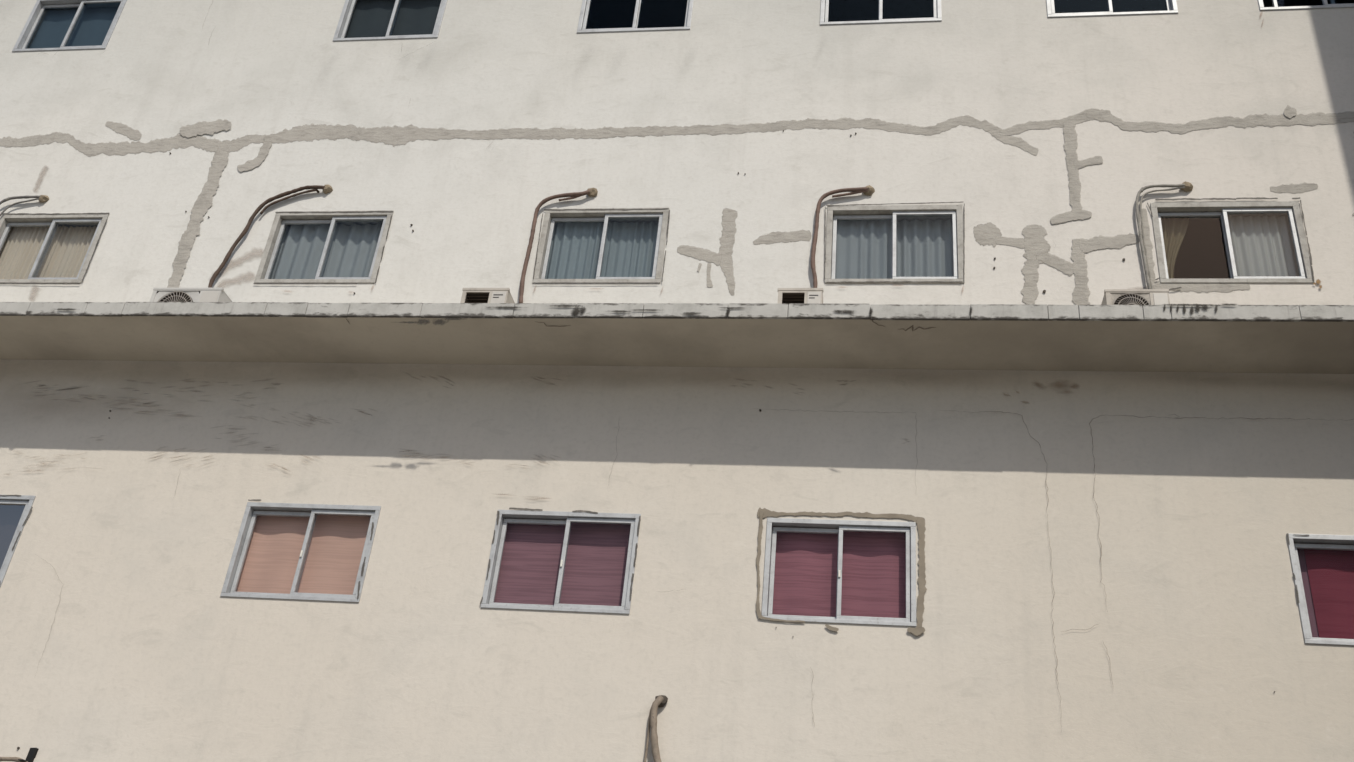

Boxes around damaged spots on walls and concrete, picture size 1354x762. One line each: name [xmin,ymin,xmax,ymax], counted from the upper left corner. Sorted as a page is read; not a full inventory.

crack [754,408,1353,732]